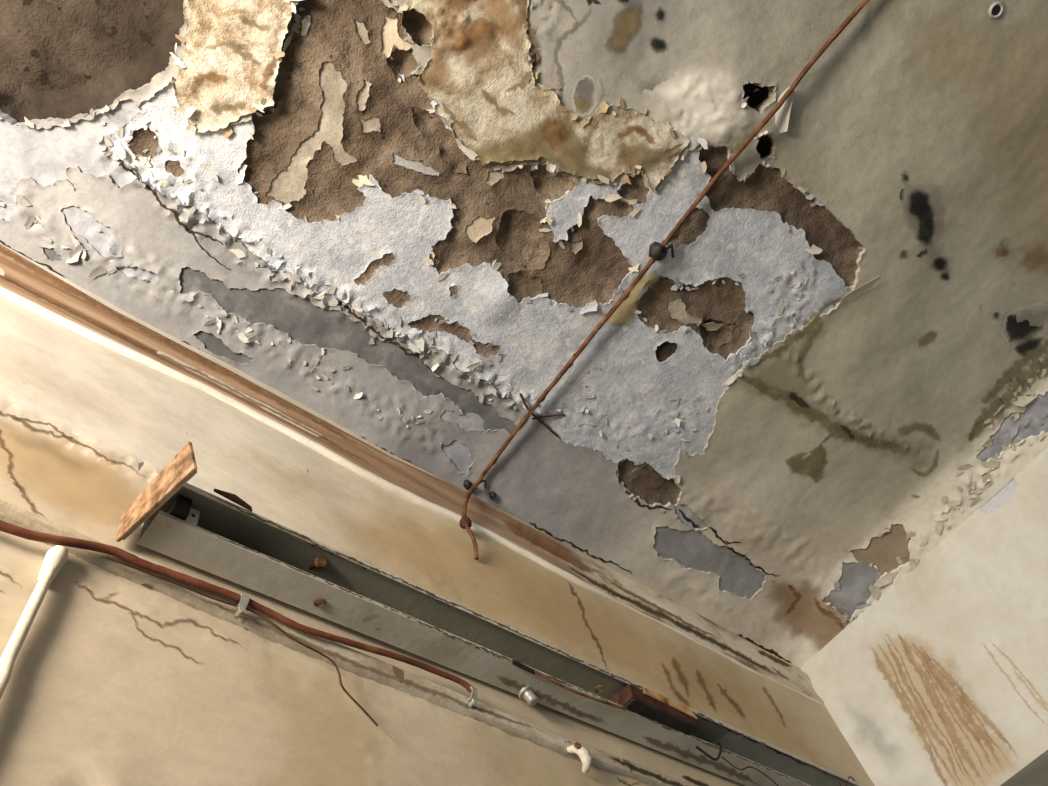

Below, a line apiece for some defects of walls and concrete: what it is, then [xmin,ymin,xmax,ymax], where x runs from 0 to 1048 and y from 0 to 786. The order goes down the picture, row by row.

water stain [900,175,949,280]
peeling [0,0,880,599]
crack [0,412,114,513]
crack [80,586,235,662]
crack [570,585,606,665]
water stain [876,638,1010,784]